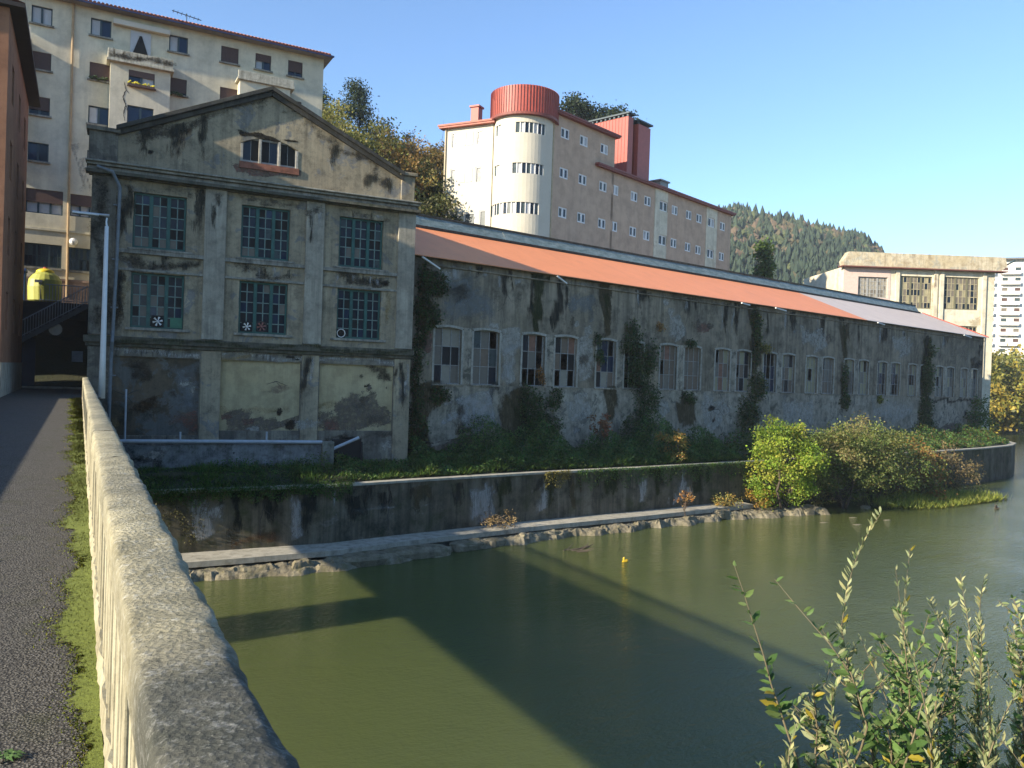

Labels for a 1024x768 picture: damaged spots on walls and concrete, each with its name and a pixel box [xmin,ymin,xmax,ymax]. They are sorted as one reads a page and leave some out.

water stain [137,98,265,155]
water stain [549,278,574,330]
peeling [221,408,299,431]
peeling [318,384,391,431]
water stain [189,489,318,540]
water stain [452,476,512,521]
water stain [639,466,711,504]